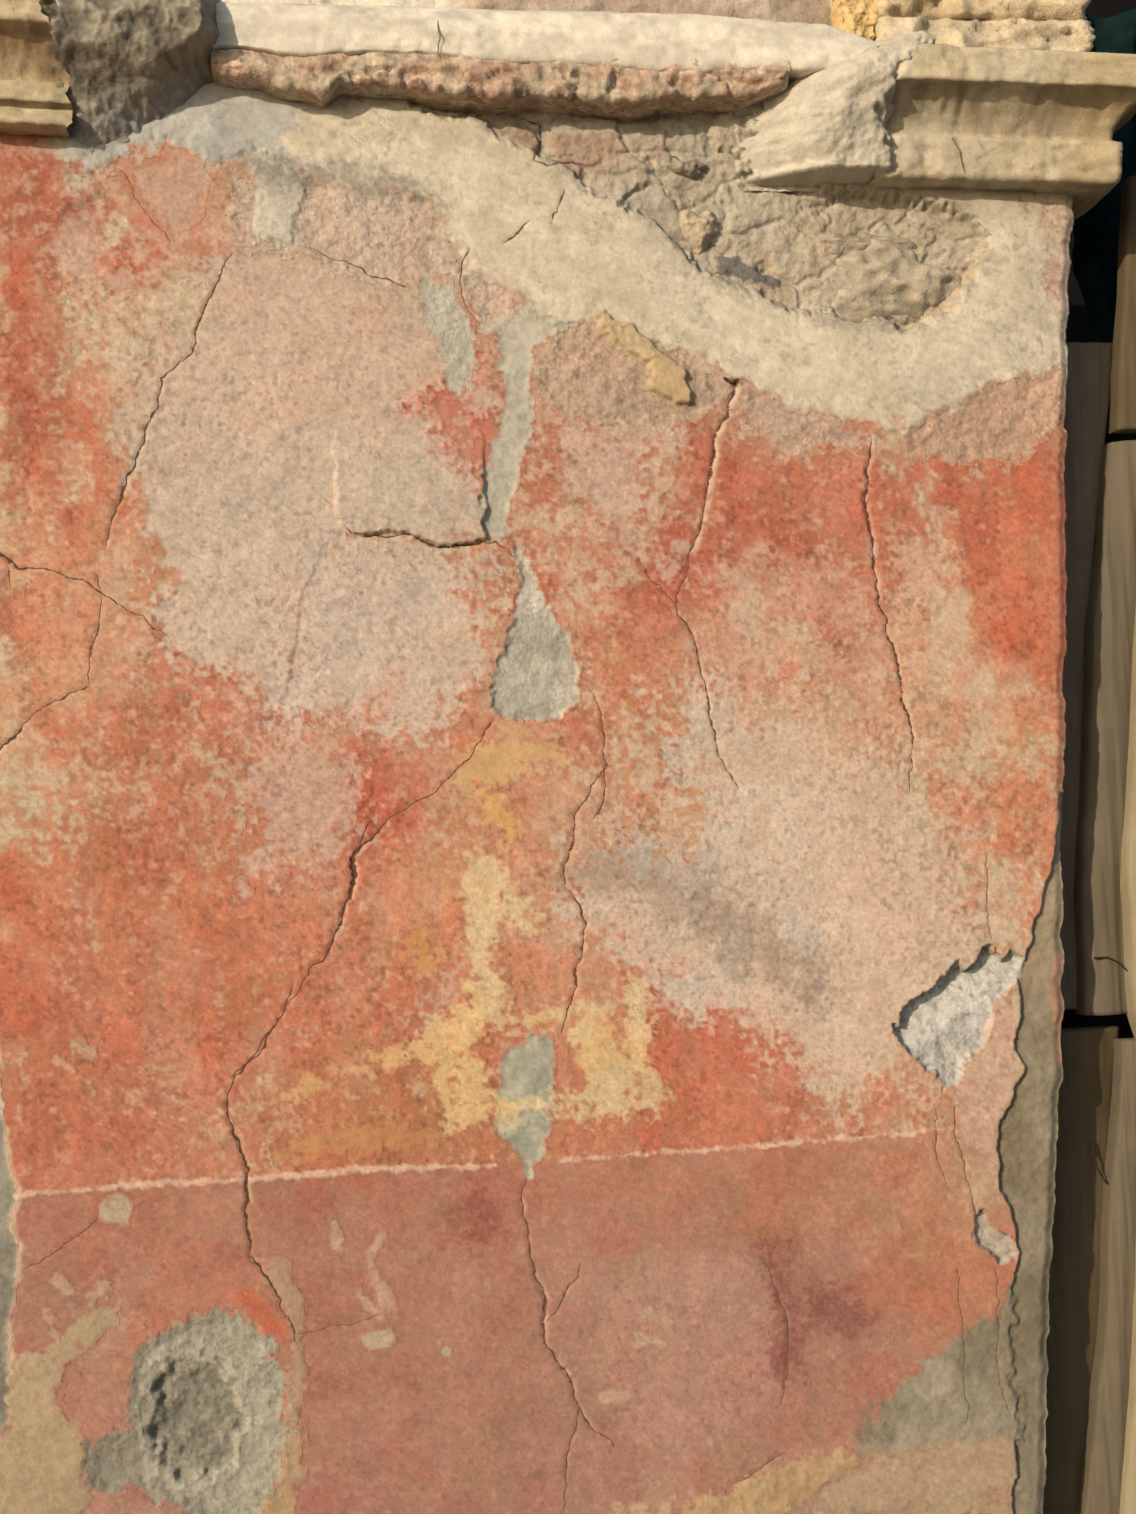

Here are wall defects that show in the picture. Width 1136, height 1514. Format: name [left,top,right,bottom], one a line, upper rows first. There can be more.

flaking render [405,100,992,333]
crack [0,254,232,750]
crack [226,721,493,1345]
crack [344,525,516,558]
crack [561,685,607,1034]
crack [638,389,738,788]
peeling [528,304,1025,1131]
crack [863,437,914,791]
flaking render [901,367,1067,475]
crack [520,1178,614,1513]